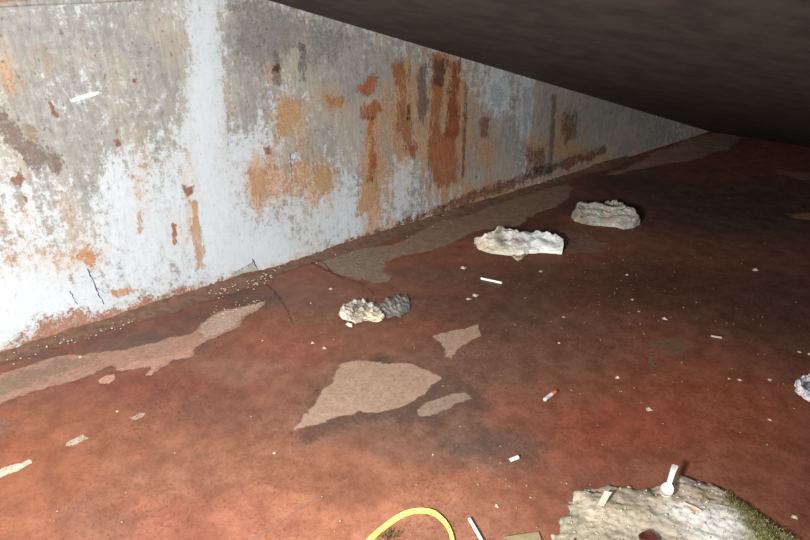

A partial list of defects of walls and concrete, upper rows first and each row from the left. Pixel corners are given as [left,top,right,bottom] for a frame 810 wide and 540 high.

corrosion [345,52,606,243]
corrosion [188,200,205,269]
corrosion [0,276,223,352]
crack [311,261,373,294]